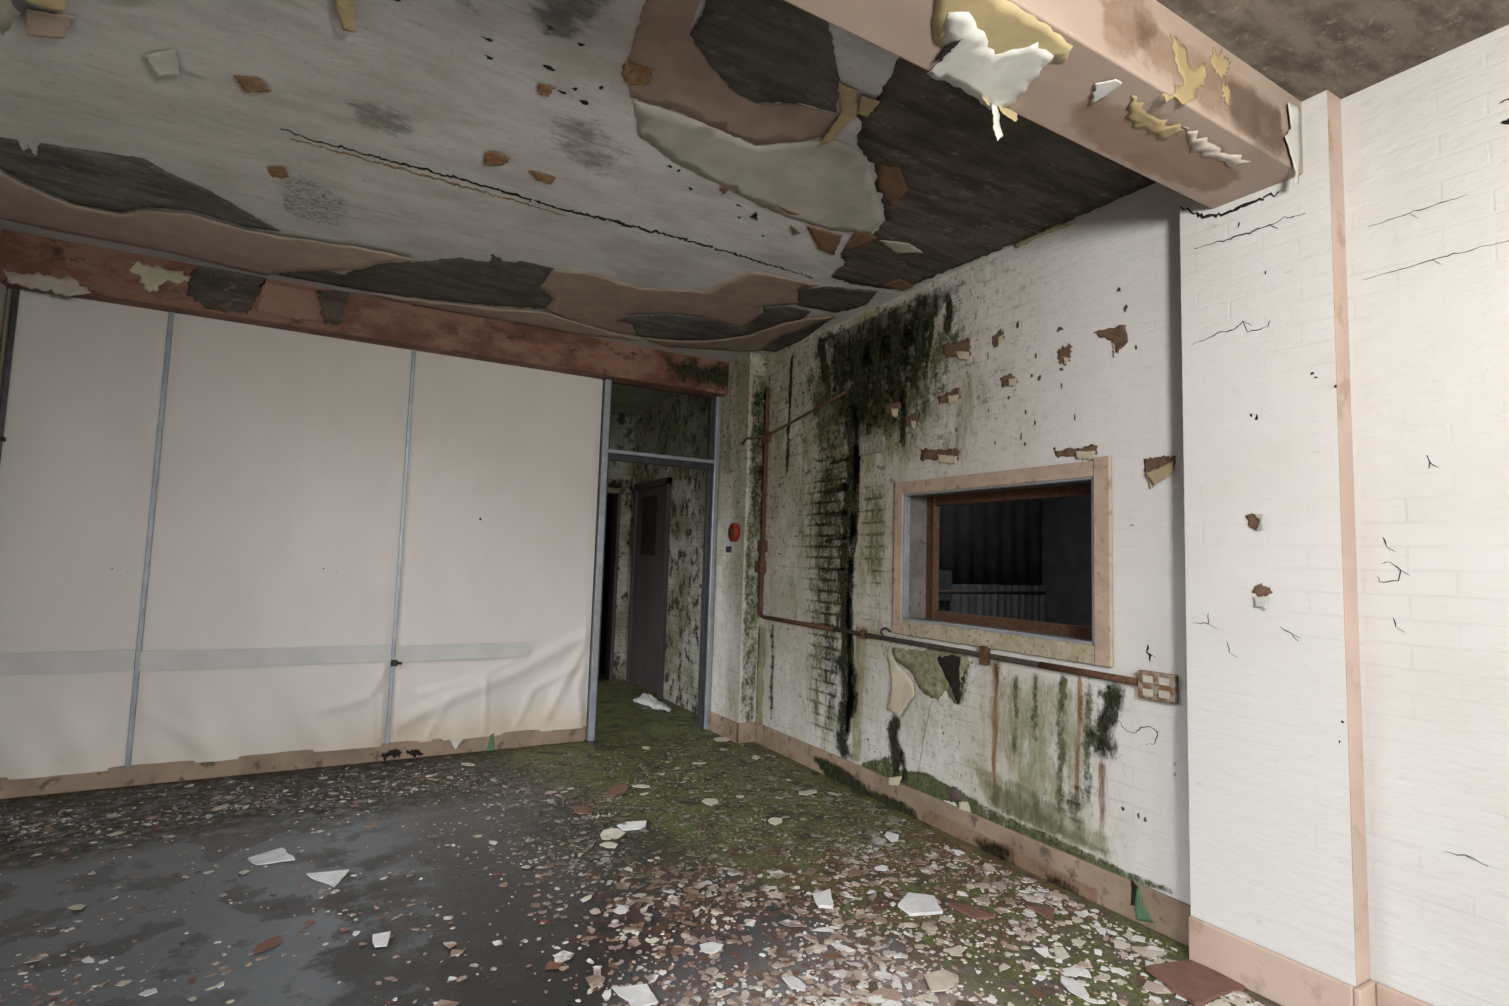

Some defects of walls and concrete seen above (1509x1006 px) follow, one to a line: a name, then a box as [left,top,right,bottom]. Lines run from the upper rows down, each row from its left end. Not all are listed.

peeling [1285,102,1302,184]
peeling [0,0,1156,391]
crack [1180,191,1305,249]
crack [1368,195,1465,227]
crack [1365,240,1509,280]
spalling [1053,444,1098,460]
spalling [1144,455,1176,488]
damp [741,376,766,722]
damp [786,281,963,818]
spalling [883,643,973,786]
damp [977,675,1124,851]
damp [976,839,1016,865]